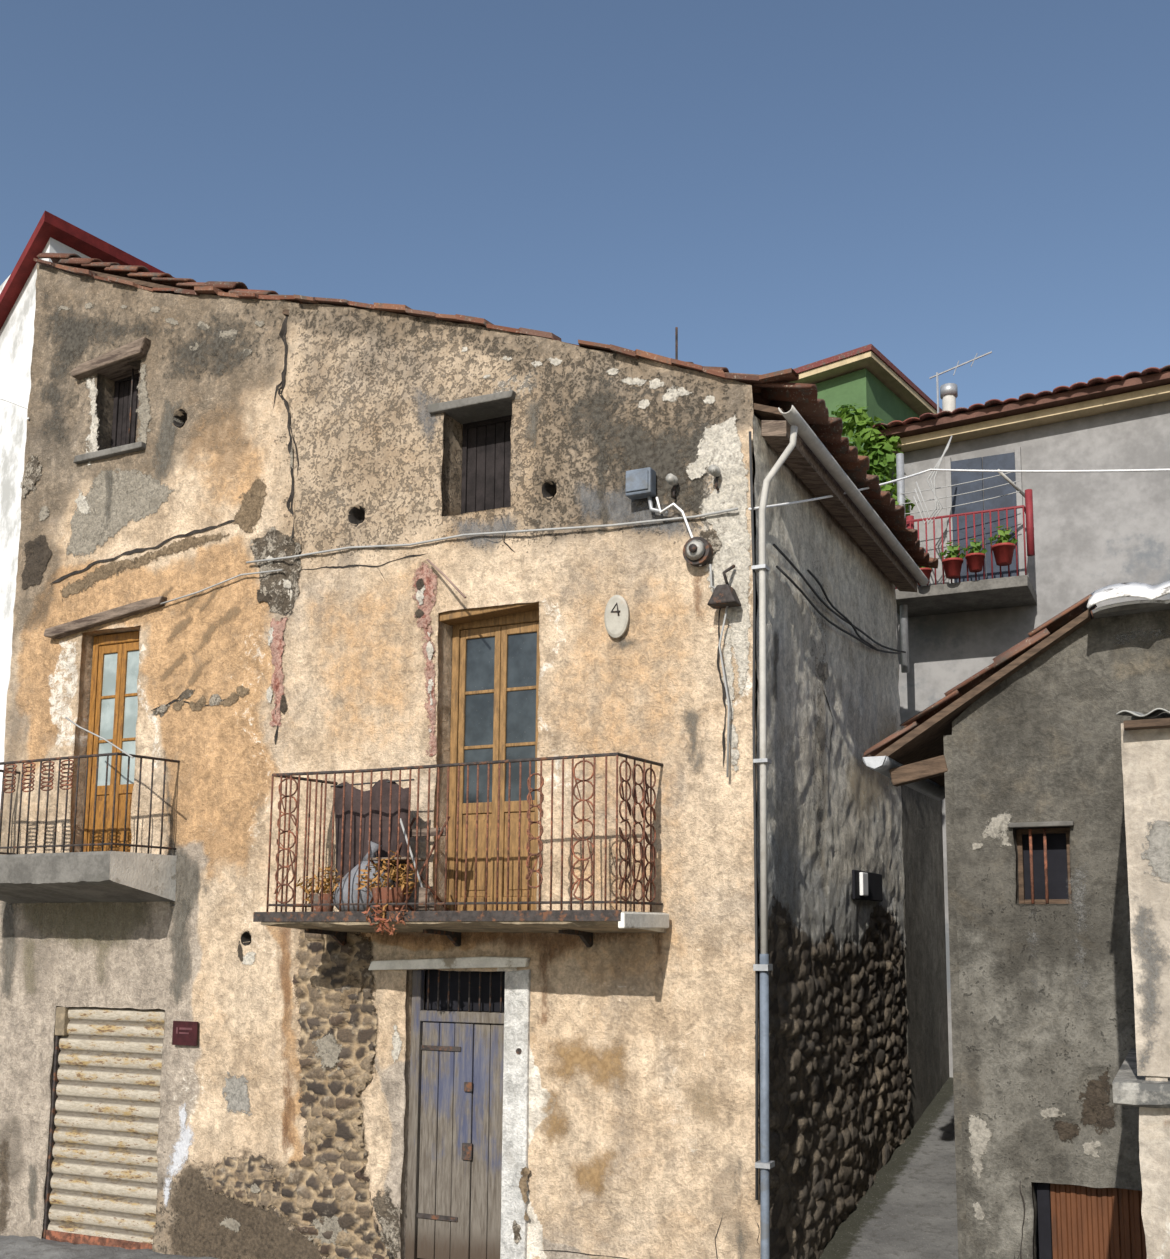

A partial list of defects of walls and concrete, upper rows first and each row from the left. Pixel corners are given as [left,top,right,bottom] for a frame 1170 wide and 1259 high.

peeling [136,364,152,443]
peeling [606,368,715,409]
crack [273,315,426,659]
peeling [20,376,301,726]
peeling [686,415,751,771]
crack [151,690,238,711]
crack [272,704,280,745]
spalling [167,929,402,1259]
leakage [544,1095,567,1136]
leakage [557,1042,623,1084]
leakage [575,1153,610,1193]
peeling [968,1115,993,1180]